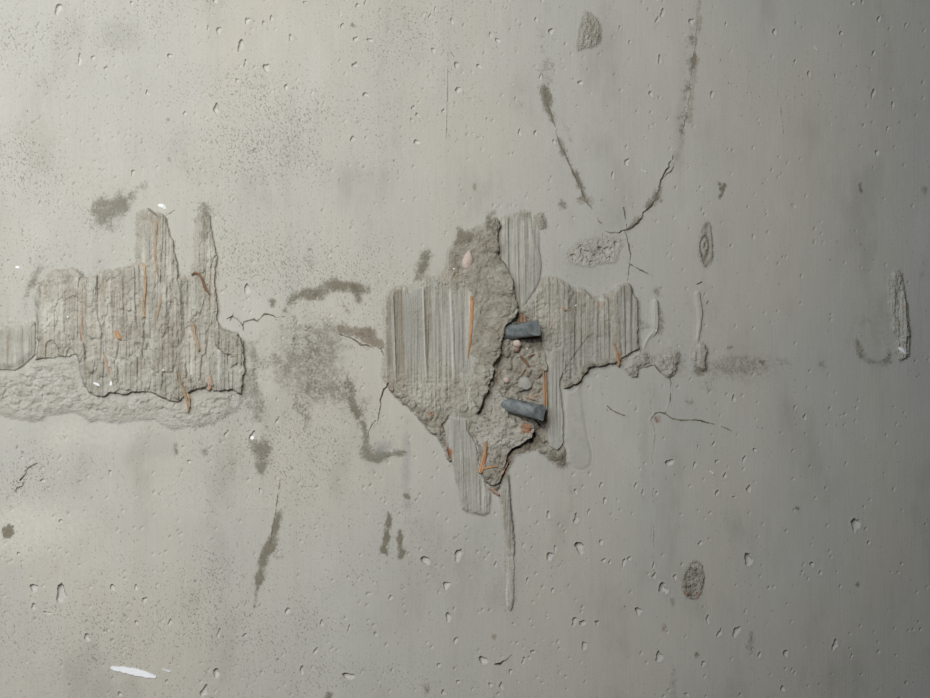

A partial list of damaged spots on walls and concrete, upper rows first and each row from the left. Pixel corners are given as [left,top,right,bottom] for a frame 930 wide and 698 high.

crack [542,0,701,281]
spalling [563,235,625,269]
spalling [467,310,549,494]
crack [605,365,733,433]